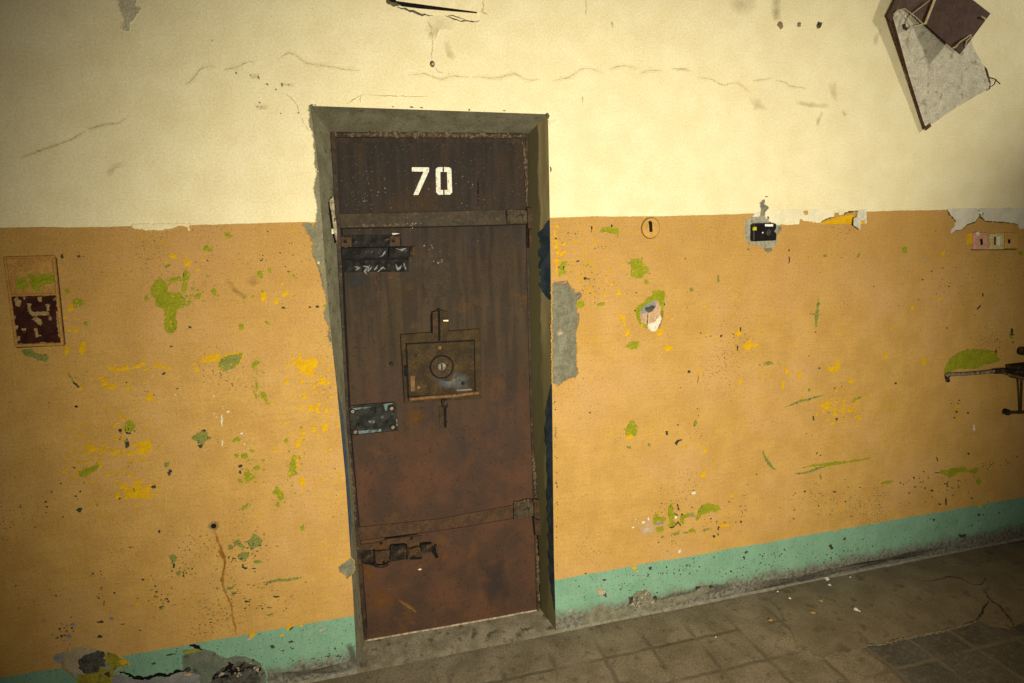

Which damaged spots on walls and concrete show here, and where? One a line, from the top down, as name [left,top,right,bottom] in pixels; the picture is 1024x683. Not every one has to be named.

crack [185,61,253,85]
crack [278,2,802,104]
crack [21,118,127,158]
peeling [744,196,867,280]
peeling [946,207,1024,234]
peeling [192,104,355,579]
spalling [616,255,759,355]
spalling [538,220,621,610]
peeling [609,408,745,452]
rust [211,524,236,627]
crack [931,576,1014,626]
spalling [51,617,268,683]